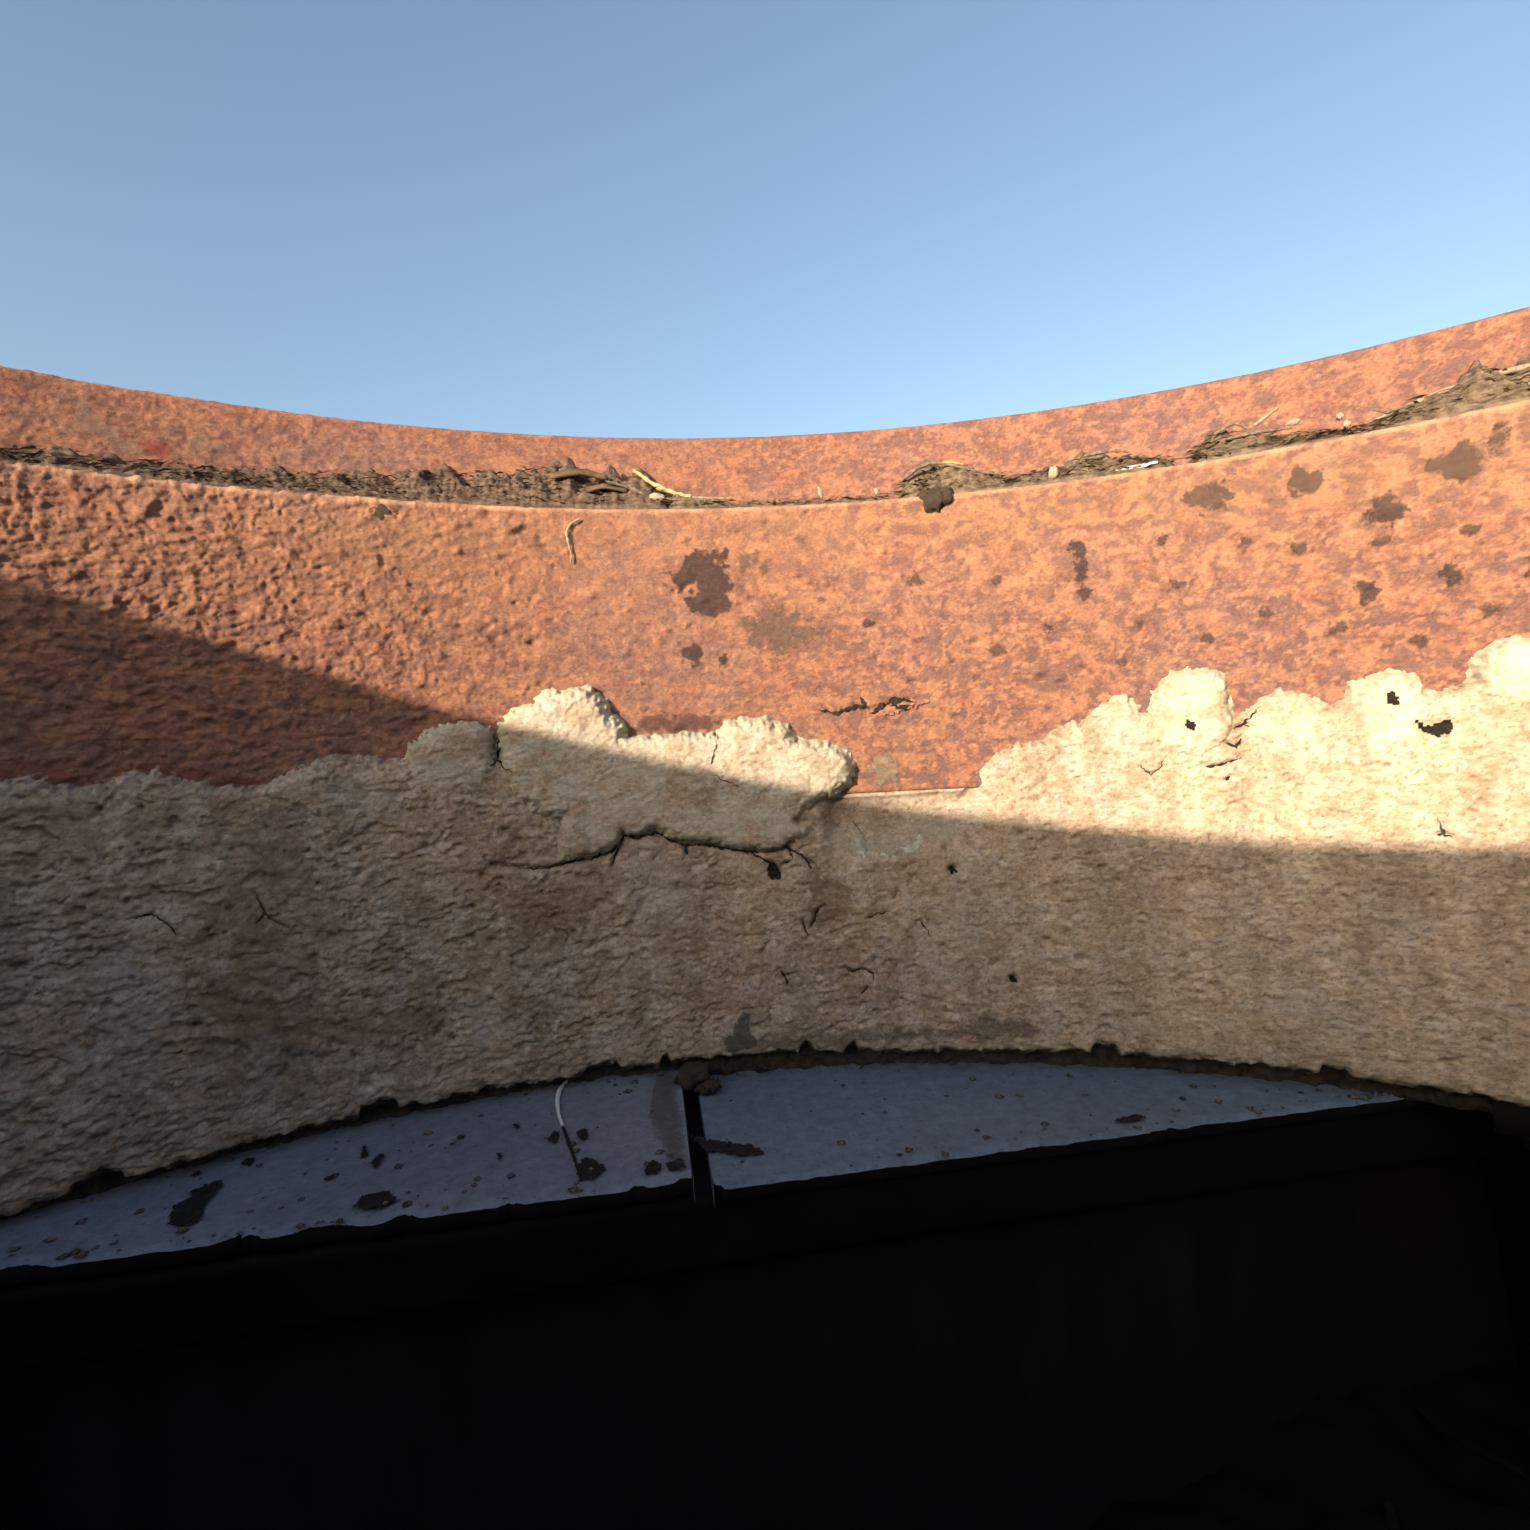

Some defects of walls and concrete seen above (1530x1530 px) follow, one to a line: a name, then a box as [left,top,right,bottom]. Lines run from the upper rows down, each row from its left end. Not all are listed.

rust [1424,421,1512,487]
rust [1182,480,1236,516]
rust [1288,465,1323,498]
rust [1361,490,1411,544]
rust [663,547,734,618]
rust [1067,540,1092,601]
rust [1353,580,1382,605]
rust [630,710,718,734]
rust [818,696,929,716]
peeling [556,730,857,861]
crack [501,831,812,870]
crack [802,906,821,936]